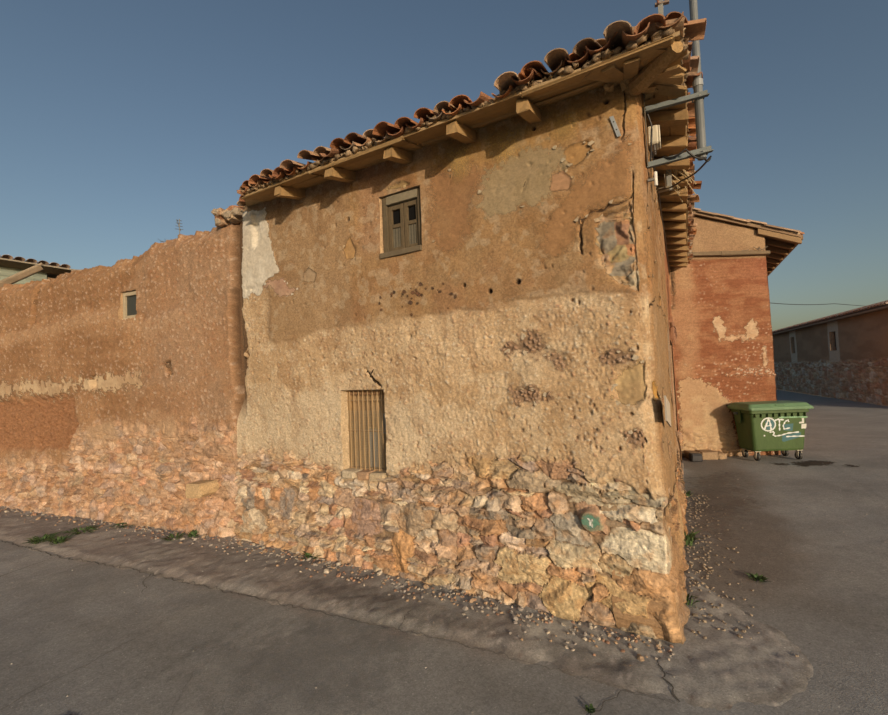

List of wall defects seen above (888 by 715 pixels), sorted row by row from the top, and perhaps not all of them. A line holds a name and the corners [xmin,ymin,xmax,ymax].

peeling [476,137,595,219]
peeling [241,207,299,299]
spalling [578,197,640,291]
peeling [712,316,776,377]
peeling [664,376,740,515]